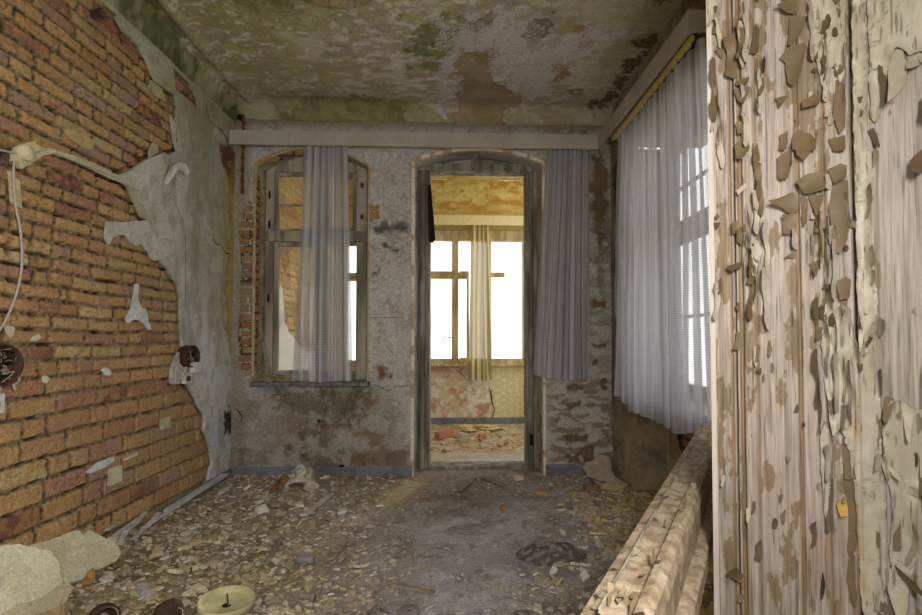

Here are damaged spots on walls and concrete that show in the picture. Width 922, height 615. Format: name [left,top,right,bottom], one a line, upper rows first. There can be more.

water stain [113,0,199,84]
spalling [269,149,306,163]
water stain [280,95,408,123]
water stain [403,12,467,71]
peeling [427,4,658,126]
spalling [0,0,210,546]
spalling [237,173,263,376]
peeling [707,0,922,615]